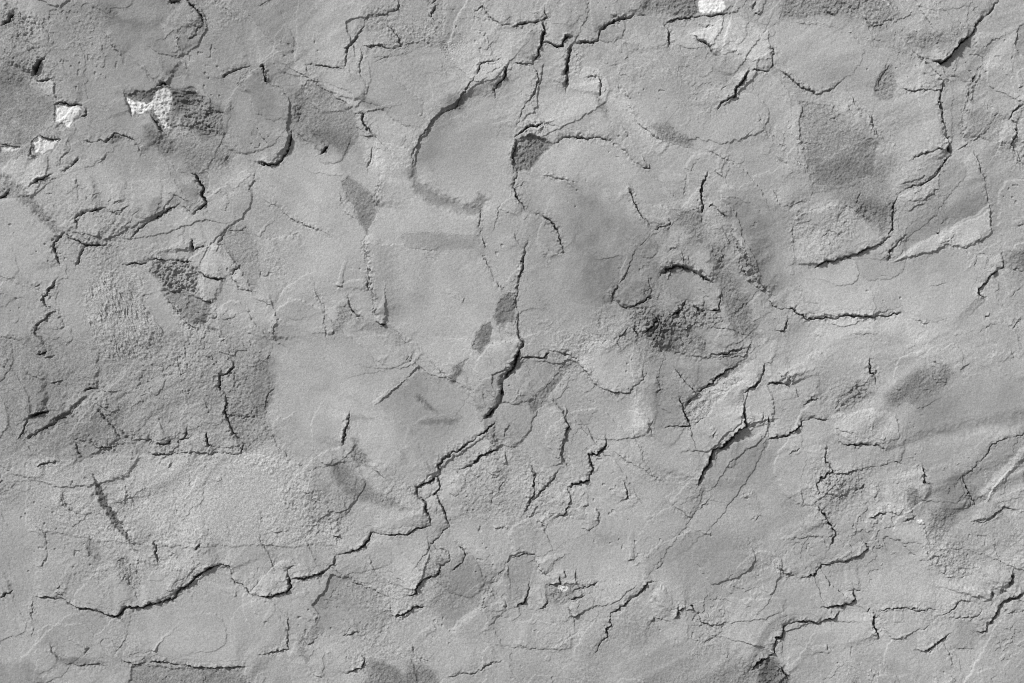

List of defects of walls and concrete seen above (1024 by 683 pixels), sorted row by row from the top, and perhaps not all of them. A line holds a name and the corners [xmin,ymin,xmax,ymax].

flaking render [643,0,758,25]
flaking render [0,98,149,187]
flaking render [125,80,227,138]
crack [474,5,719,138]
crack [717,68,770,111]
flaking render [763,46,776,70]
crack [899,58,987,194]
flaking render [0,181,12,200]
crack [33,231,110,344]
crack [415,208,577,527]
crack [595,581,654,653]
crack [986,573,1024,629]